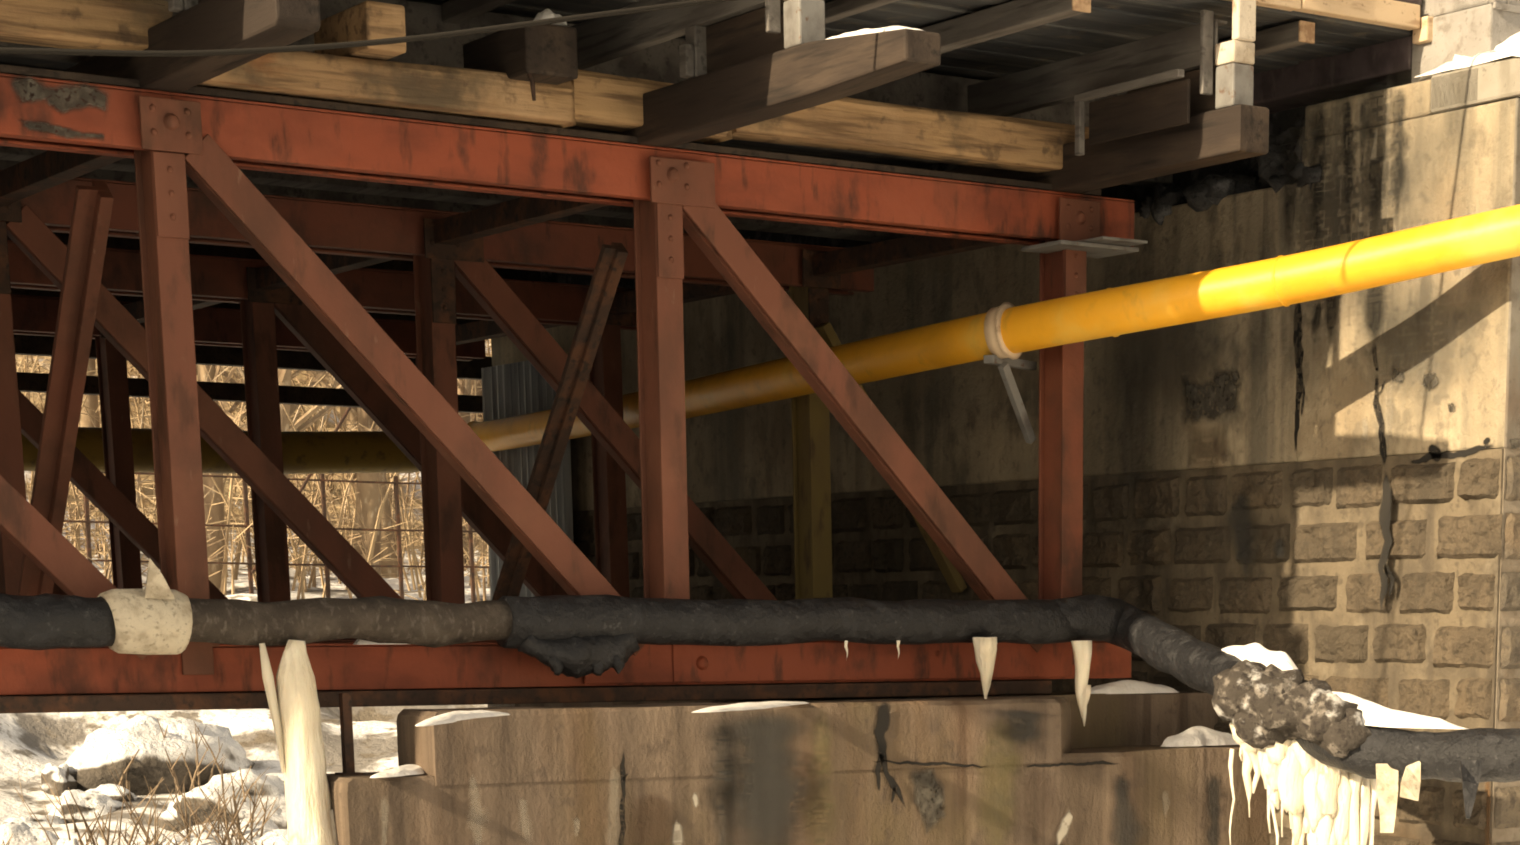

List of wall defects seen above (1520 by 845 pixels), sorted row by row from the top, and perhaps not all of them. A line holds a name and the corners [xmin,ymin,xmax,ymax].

damp [1285,85,1420,251]
crack [1294,303,1305,449]
damp [1312,296,1337,336]
damp [1367,285,1386,336]
crack [1372,344,1491,609]
damp [673,822,682,845]
damp [693,716,803,845]
crack [874,702,905,806]